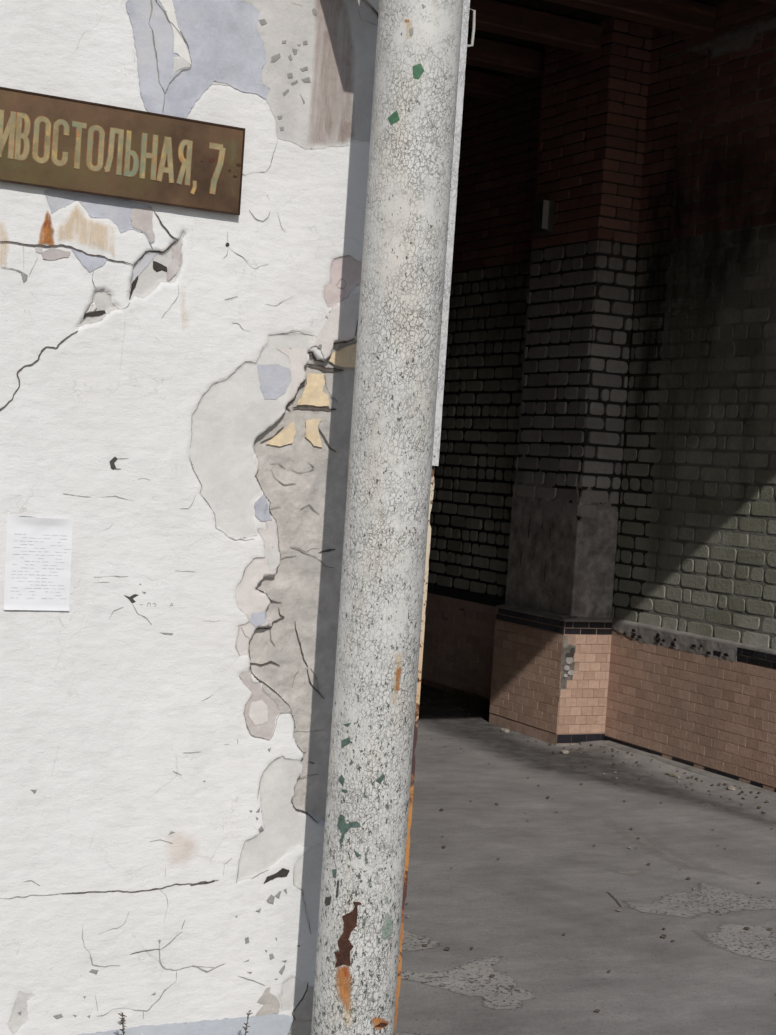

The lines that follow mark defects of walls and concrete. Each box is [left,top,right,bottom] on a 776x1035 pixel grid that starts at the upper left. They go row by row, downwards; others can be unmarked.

peeling [126,0,379,149]
peeling [413,63,424,79]
crack [0,213,178,291]
peeling [44,189,155,244]
spalling [84,302,106,319]
crack [0,331,77,410]
spalling [189,255,362,933]
peeling [612,622,737,662]
crack [3,869,224,1019]
peeling [239,938,314,1035]
corrosion [335,902,361,1010]
corrosion [372,1018,389,1030]